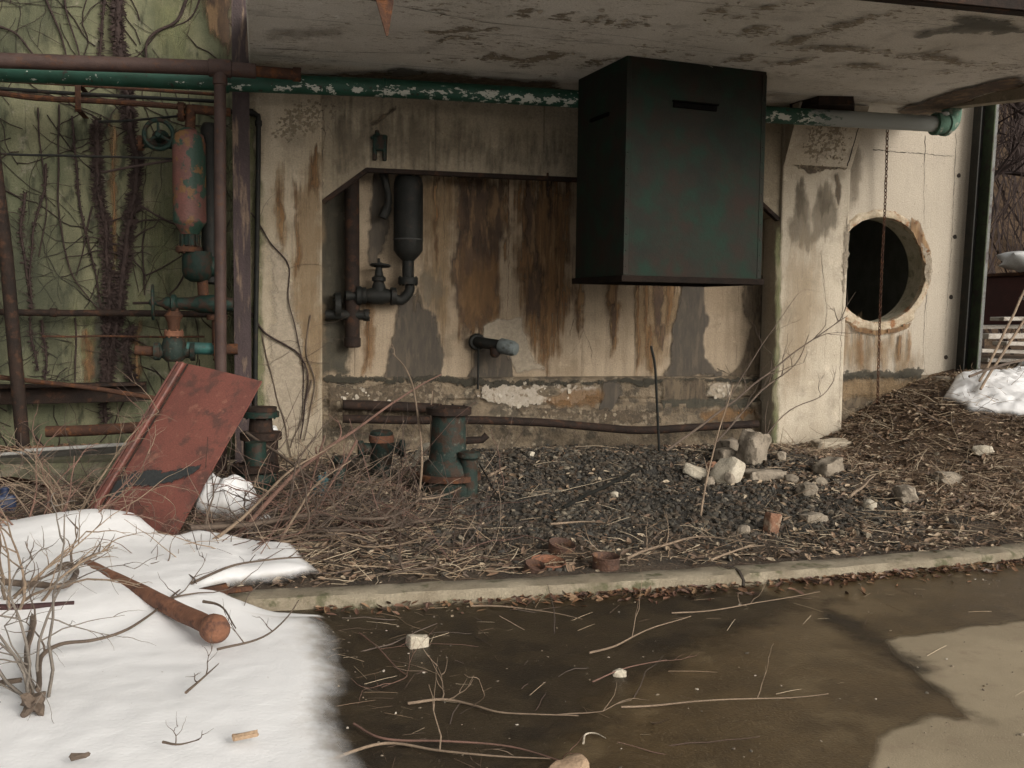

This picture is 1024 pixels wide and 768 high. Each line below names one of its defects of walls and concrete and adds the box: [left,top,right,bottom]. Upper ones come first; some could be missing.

damp [914,17,1024,39]
damp [384,166,513,378]
corrosion [513,180,585,376]
spalling [477,317,661,425]
corrosion [606,285,621,353]
corrosion [635,285,679,373]
damp [662,275,763,413]
damp [790,149,861,252]
corrosion [911,218,931,263]